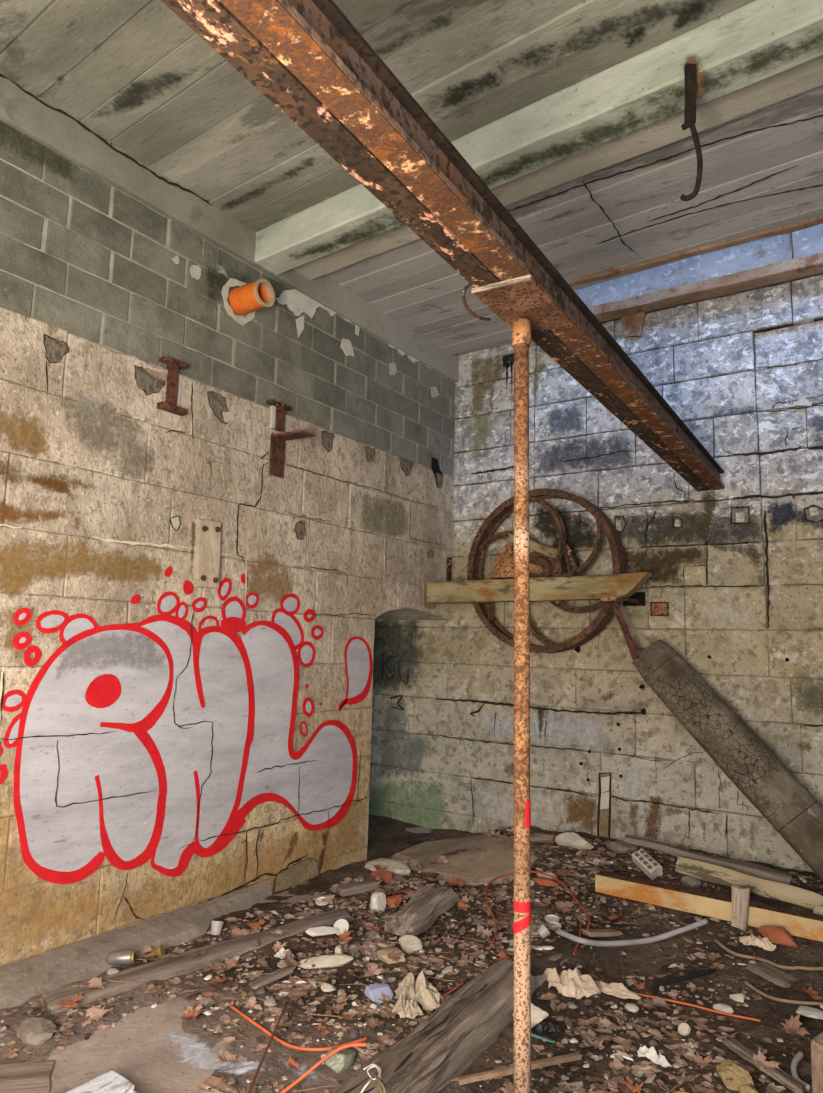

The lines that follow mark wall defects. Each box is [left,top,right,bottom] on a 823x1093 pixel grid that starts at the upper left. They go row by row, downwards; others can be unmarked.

crack [0,74,223,212]
water stain [100,73,181,114]
water stain [291,215,404,257]
water stain [442,0,713,107]
water stain [482,33,823,185]
crack [508,115,823,256]
spalling [43,334,69,363]
spalling [134,364,167,396]
peeling [253,279,373,338]
water stain [0,415,46,455]
crack [234,448,439,604]
crack [173,610,370,905]